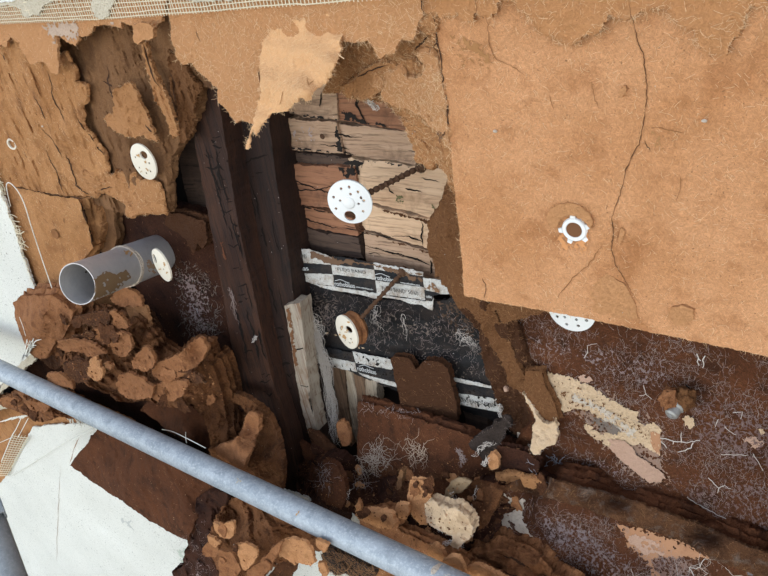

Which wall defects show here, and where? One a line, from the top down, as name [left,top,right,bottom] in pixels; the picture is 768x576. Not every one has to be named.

peeling [0,0,768,150]
crack [558,4,682,297]
spalling [165,207,213,254]
spalling [427,181,564,435]
mould [530,337,676,389]
peeling [10,395,38,422]
spalling [0,433,29,476]
mould [666,395,768,530]
mould [536,511,639,576]